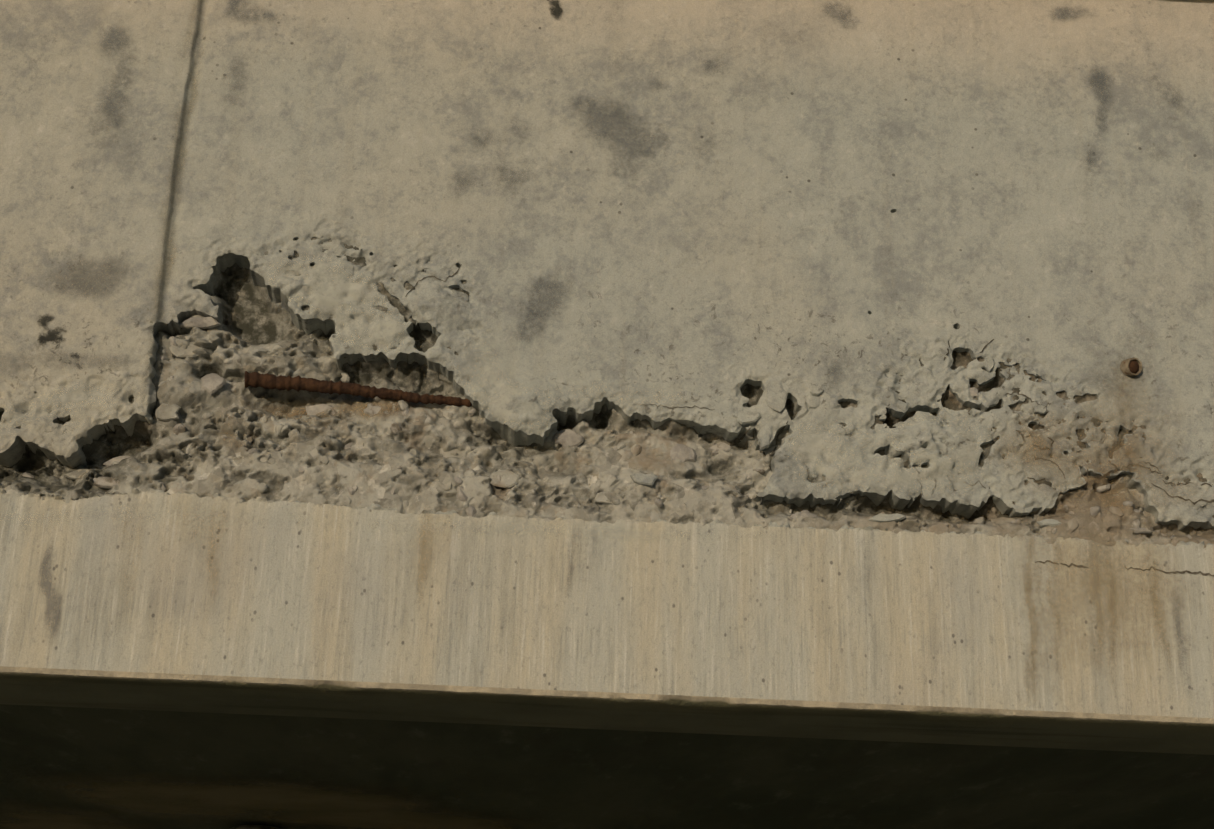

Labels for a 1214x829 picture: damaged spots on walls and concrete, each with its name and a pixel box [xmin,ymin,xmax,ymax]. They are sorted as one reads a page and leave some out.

peeling [285,237,372,276]
spalling [0,263,1214,550]
crack [1035,560,1089,568]
crack [1124,566,1214,576]